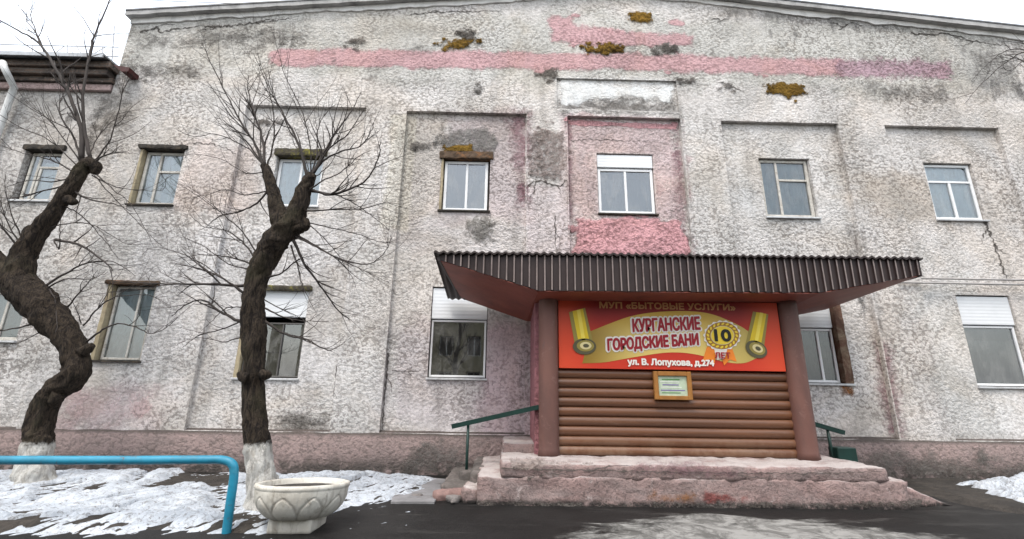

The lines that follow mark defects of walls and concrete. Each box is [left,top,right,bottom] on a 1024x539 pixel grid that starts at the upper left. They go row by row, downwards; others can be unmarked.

crack [140,18,290,33]
peeling [269,11,951,182]
crack [981,222,1007,278]